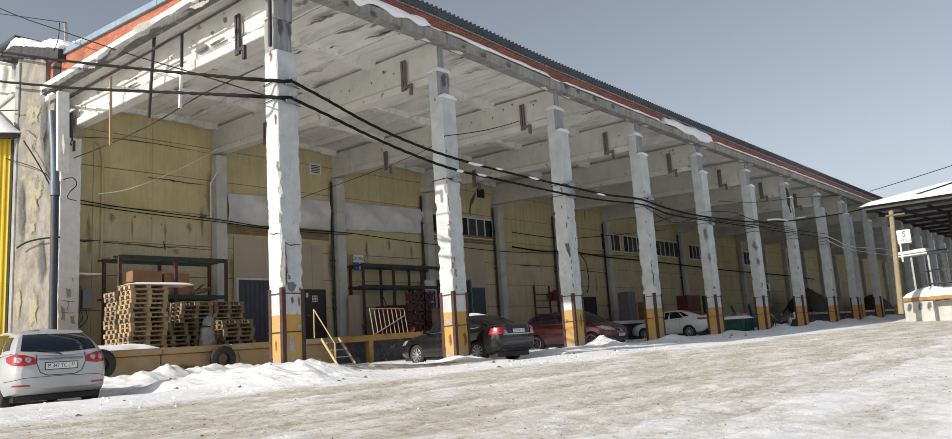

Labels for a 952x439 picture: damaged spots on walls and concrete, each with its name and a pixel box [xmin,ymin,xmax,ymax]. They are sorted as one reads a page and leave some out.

leakage [40,102,50,175]
leakage [37,240,45,281]
spalling [280,237,301,292]